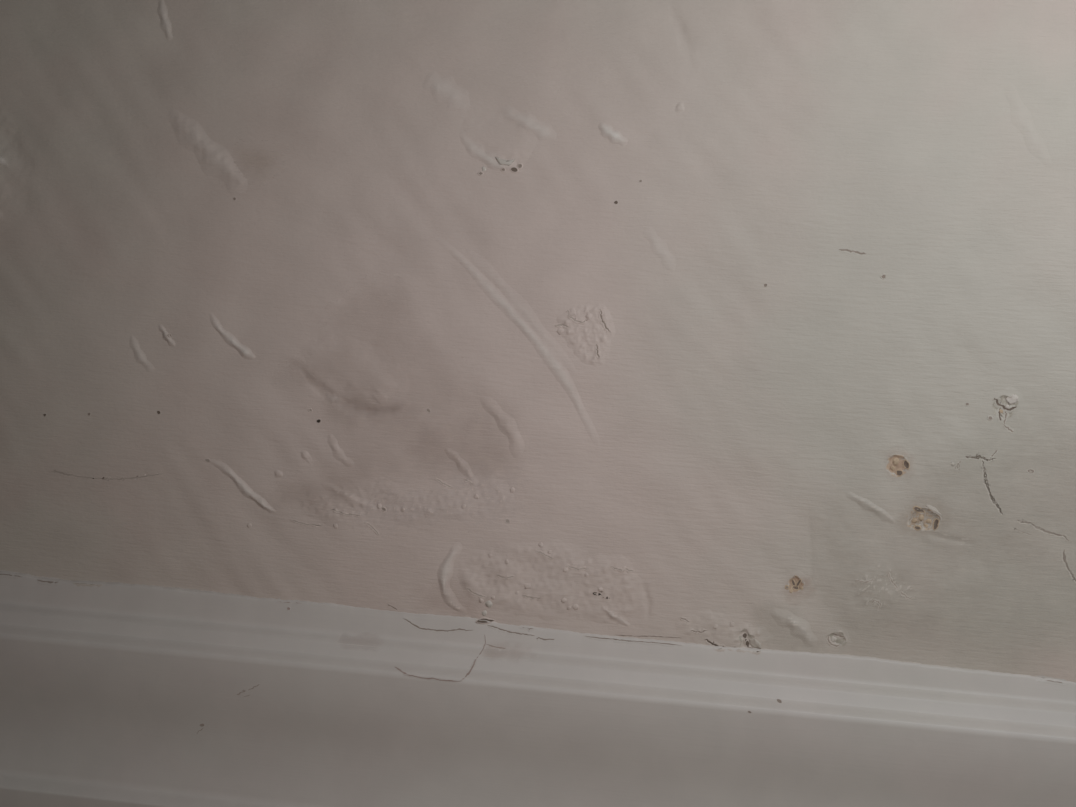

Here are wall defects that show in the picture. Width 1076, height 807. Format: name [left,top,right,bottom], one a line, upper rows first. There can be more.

spalling [986,386,1024,434]
crack [951,450,1076,585]
crack [387,603,554,683]